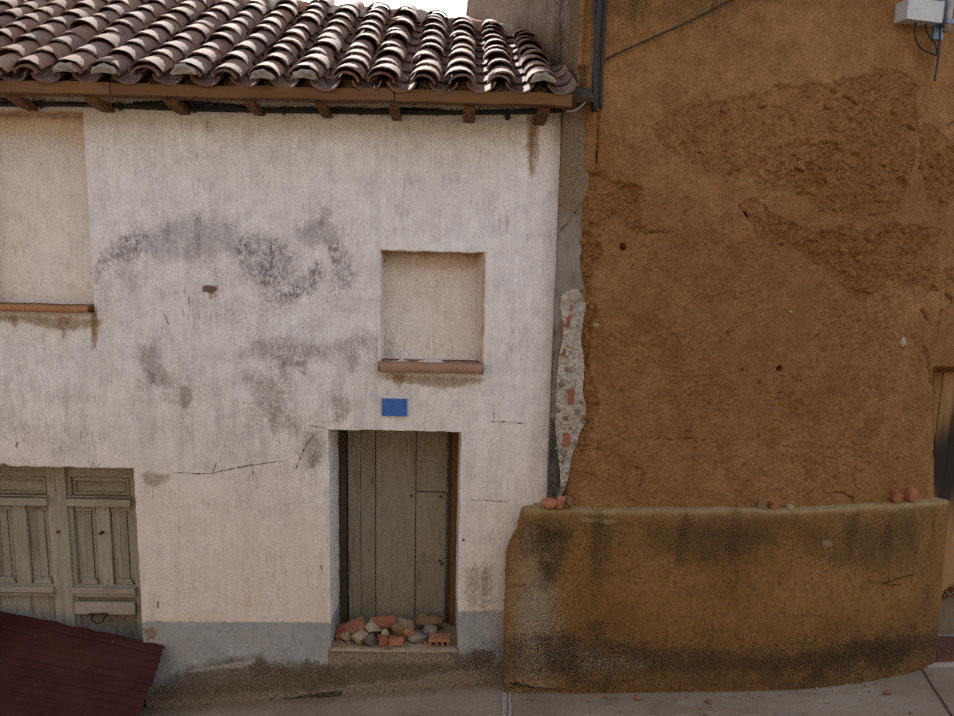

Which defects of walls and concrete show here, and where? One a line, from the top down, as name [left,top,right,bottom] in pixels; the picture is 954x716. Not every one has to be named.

spalling [554,289,587,488]
crack [176,425,324,477]
damp [156,651,493,697]